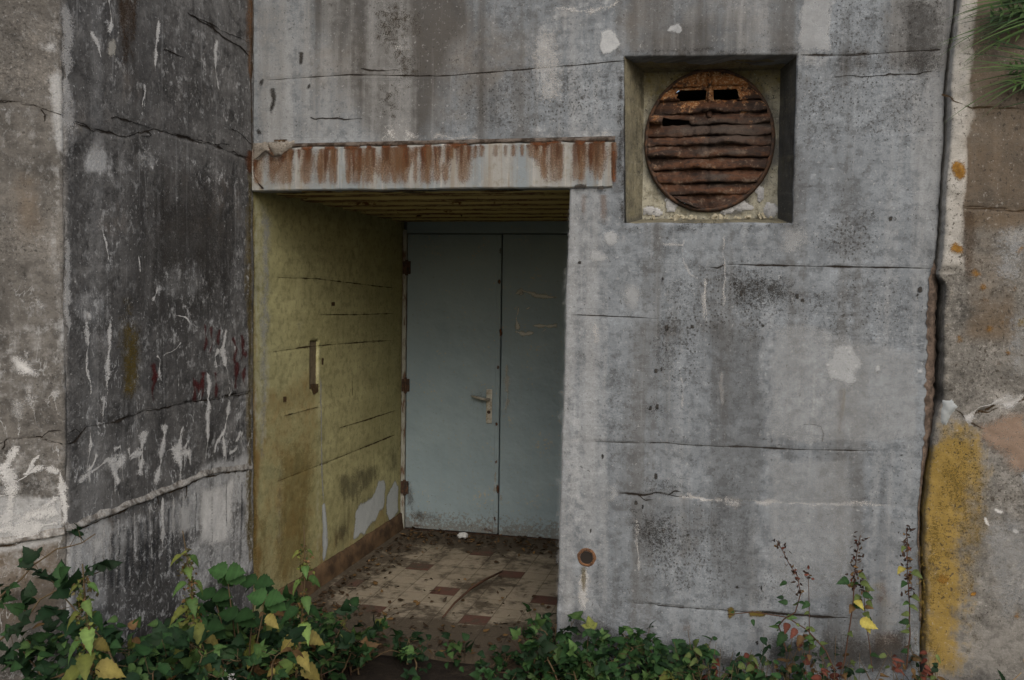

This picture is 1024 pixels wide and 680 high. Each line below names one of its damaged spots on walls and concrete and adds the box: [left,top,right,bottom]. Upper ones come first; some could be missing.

crack [0,2,625,161]
crack [802,49,1011,109]
rust [282,143,485,194]
rust [512,140,617,190]
water stain [73,183,256,588]
crack [2,392,249,449]
crack [599,424,872,451]
water stain [0,446,69,545]
crack [82,470,247,528]
peeling [353,480,398,539]
crack [624,490,687,501]
crack [633,602,847,618]